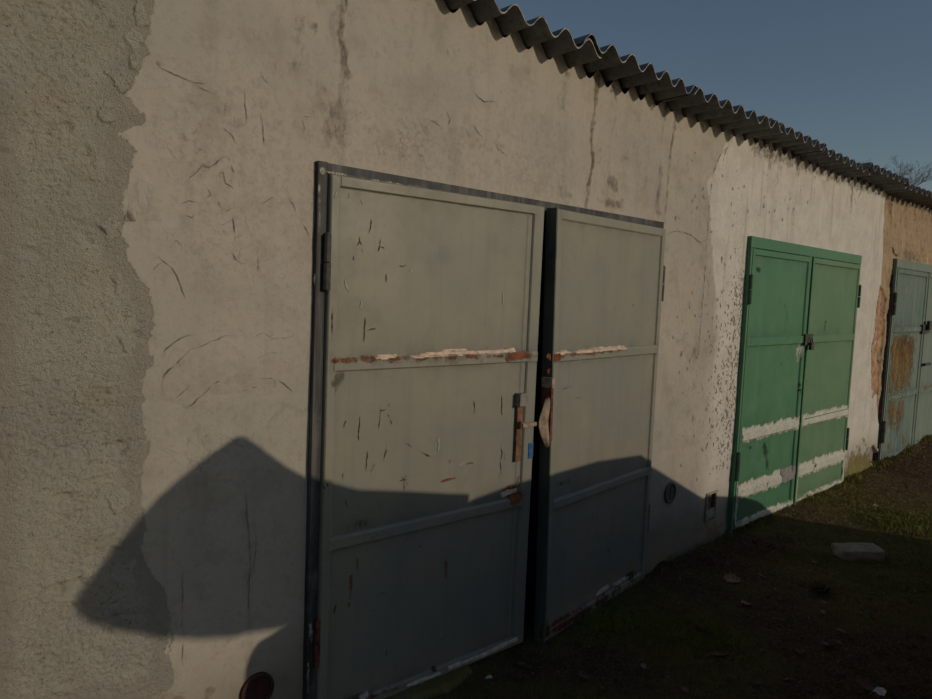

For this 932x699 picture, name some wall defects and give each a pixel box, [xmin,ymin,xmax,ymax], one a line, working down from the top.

crack [180,97,264,266]
flaking render [0,0,175,699]
flaking render [871,286,887,398]